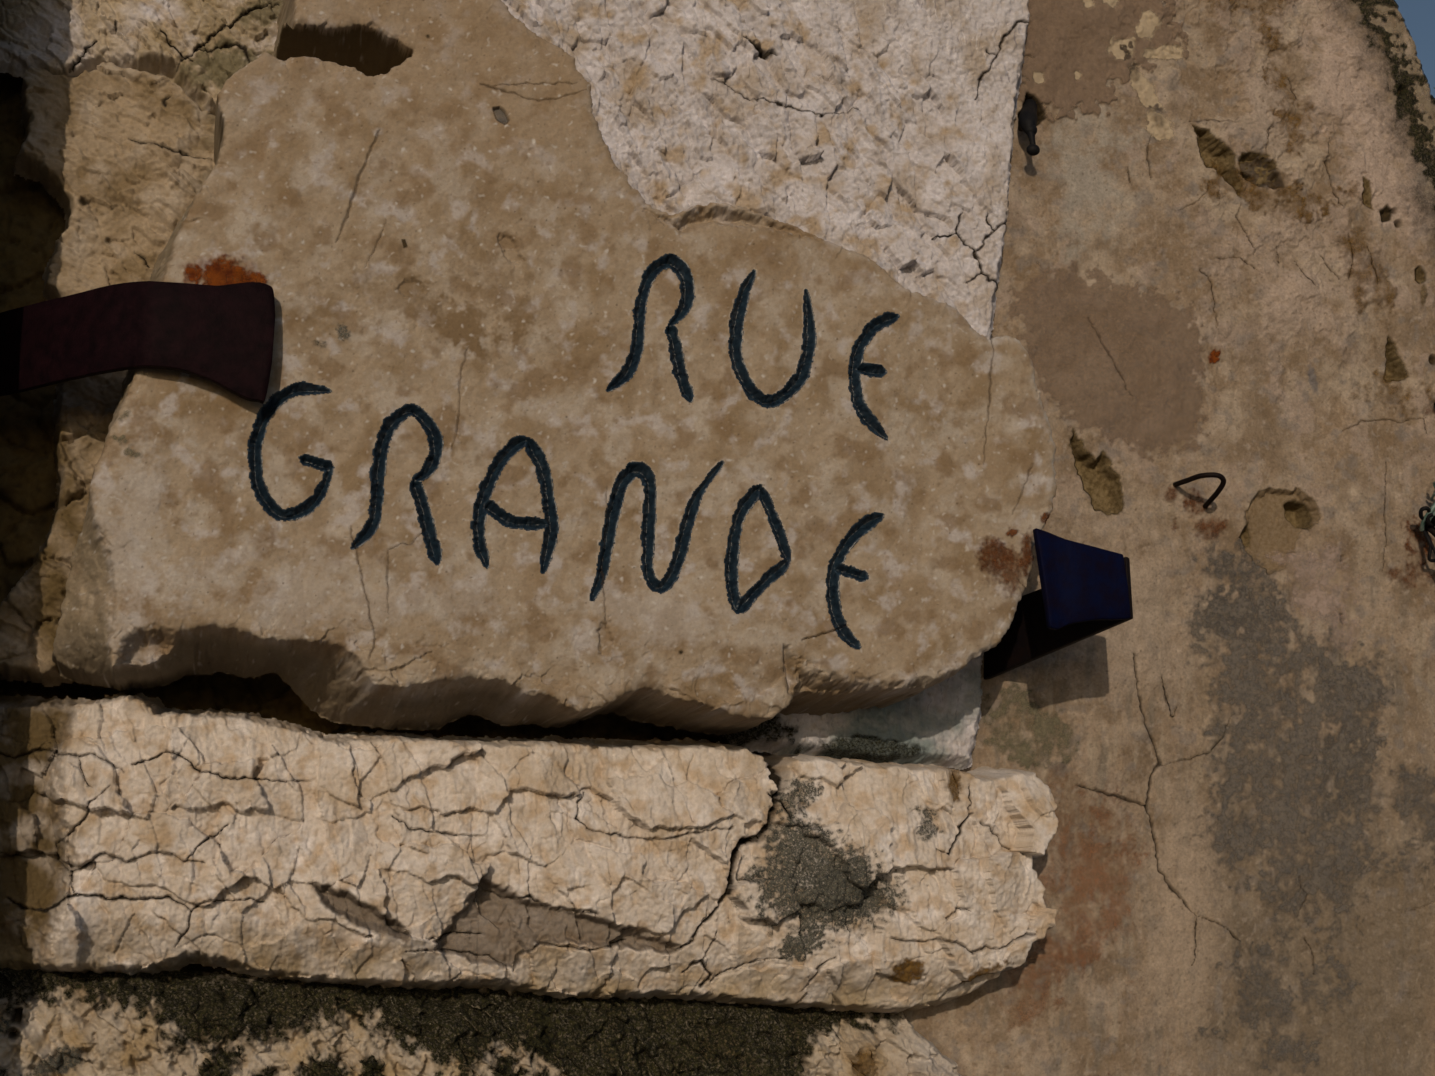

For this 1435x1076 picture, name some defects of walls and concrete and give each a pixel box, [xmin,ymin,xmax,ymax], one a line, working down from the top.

crack [975,20,1029,100]
peeling [1019,0,1189,140]
spalling [1192,125,1277,196]
crack [931,214,1006,292]
peeling [1009,261,1208,515]
spalling [1383,337,1408,382]
spalling [1239,488,1357,650]
crack [513,910,614,969]
crack [575,765,791,987]
crack [1076,659,1234,966]